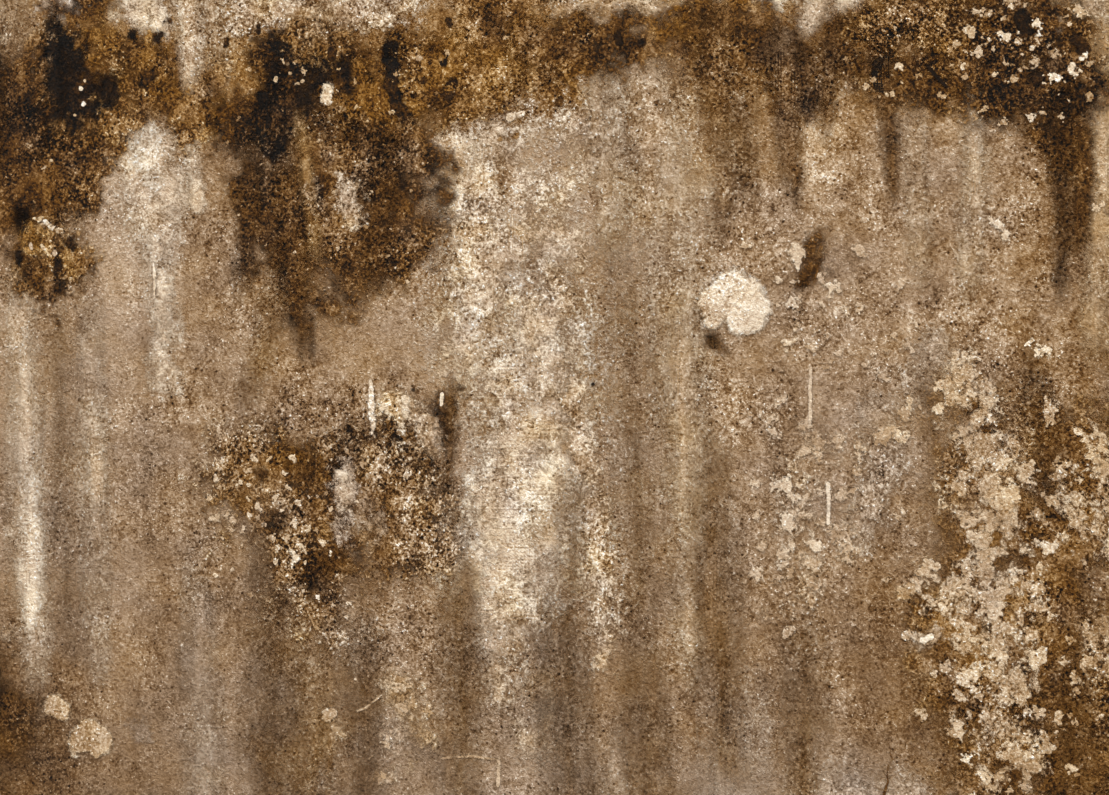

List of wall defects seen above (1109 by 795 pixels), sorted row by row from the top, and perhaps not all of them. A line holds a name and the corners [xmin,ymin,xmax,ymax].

leakage [747,0,1109,294]
peeling [178,412,500,654]
leakage [0,0,781,795]
spalling [706,333,727,356]
peeling [741,321,1109,795]
leakage [1030,376,1059,500]
crack [875,745,893,795]